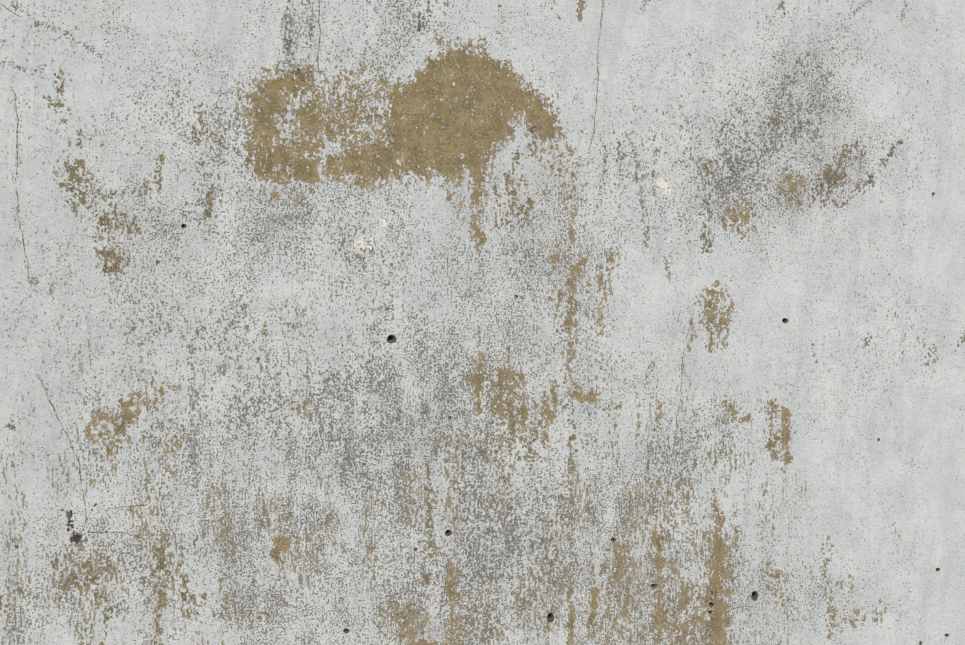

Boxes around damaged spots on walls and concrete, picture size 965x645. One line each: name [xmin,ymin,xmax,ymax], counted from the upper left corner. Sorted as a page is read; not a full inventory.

peeling [43,69,72,124]
crack [588,0,605,153]
peeling [54,114,165,280]
peeling [191,33,622,482]
peeling [687,280,735,353]
peeling [83,381,177,459]
peeling [155,425,190,477]
peeling [763,398,795,473]
peeling [481,496,539,514]
peeling [387,463,463,645]
peeling [559,488,740,645]